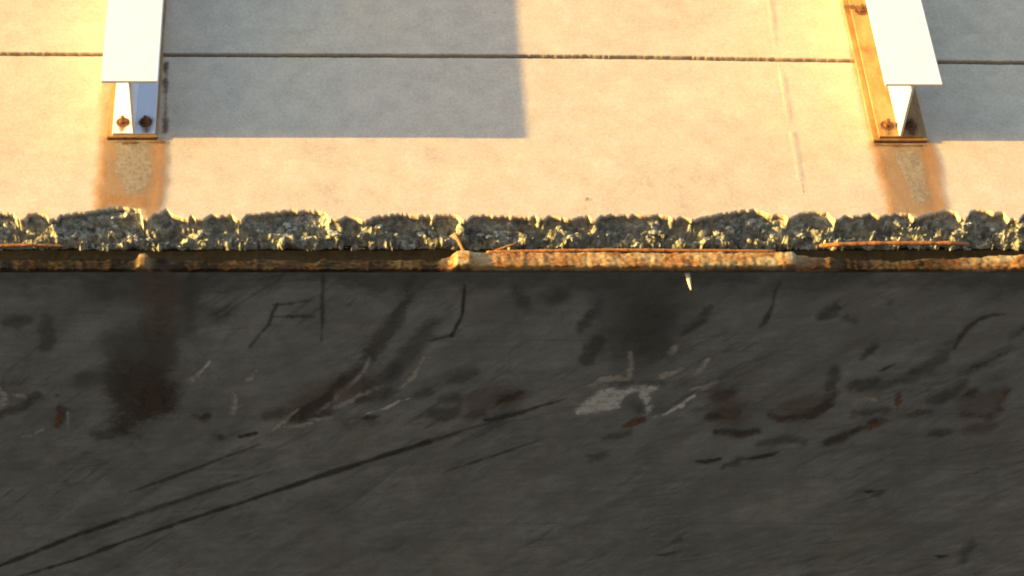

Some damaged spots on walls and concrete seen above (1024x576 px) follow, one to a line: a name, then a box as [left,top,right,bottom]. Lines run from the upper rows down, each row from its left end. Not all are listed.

corrosion [102,108,168,216]
corrosion [875,128,936,216]
spalling [0,209,1024,253]
crack [431,288,465,341]
crack [954,315,999,348]
leakage [576,351,718,418]